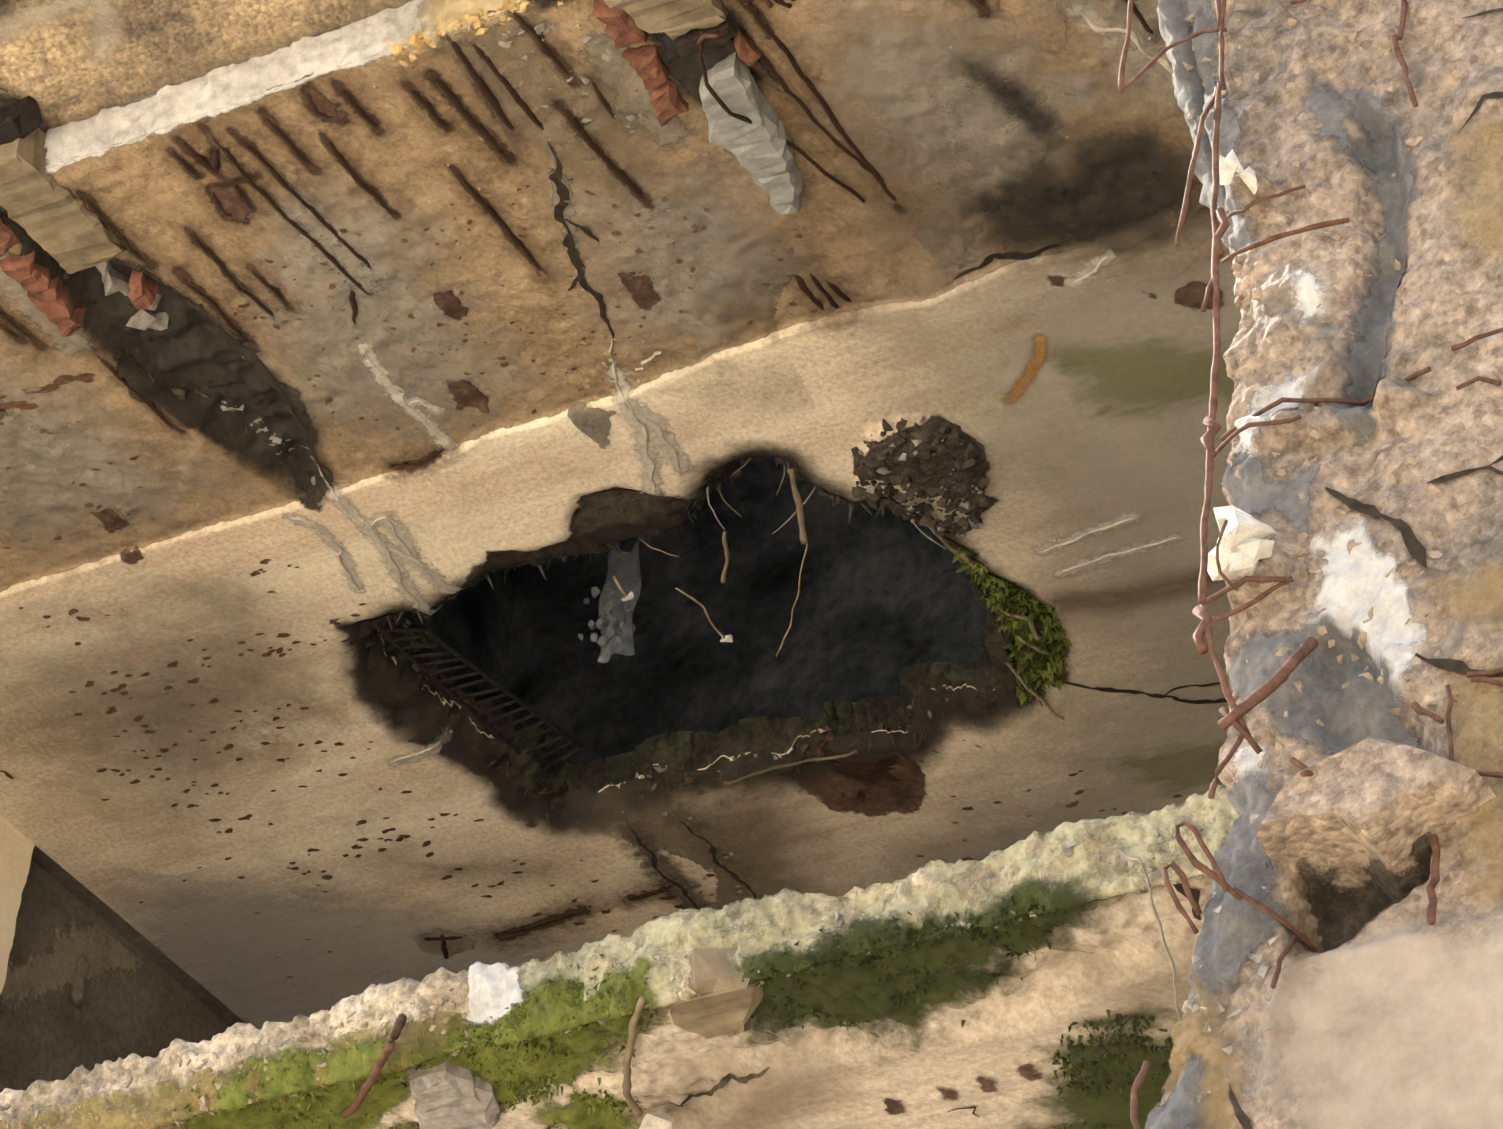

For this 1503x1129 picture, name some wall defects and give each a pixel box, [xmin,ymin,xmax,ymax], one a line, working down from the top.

water stain [1066,0,1174,88]
crack [547,140,615,339]
spalling [44,0,1254,492]
spalling [0,291,307,593]
rust [1003,335,1047,404]
spalling [1220,450,1318,535]
spalling [335,448,1028,832]
crack [1066,682,1228,704]
rust [1218,637,1319,731]
spalling [1228,616,1427,755]
spalling [510,771,1288,1051]
spalling [0,928,486,1129]